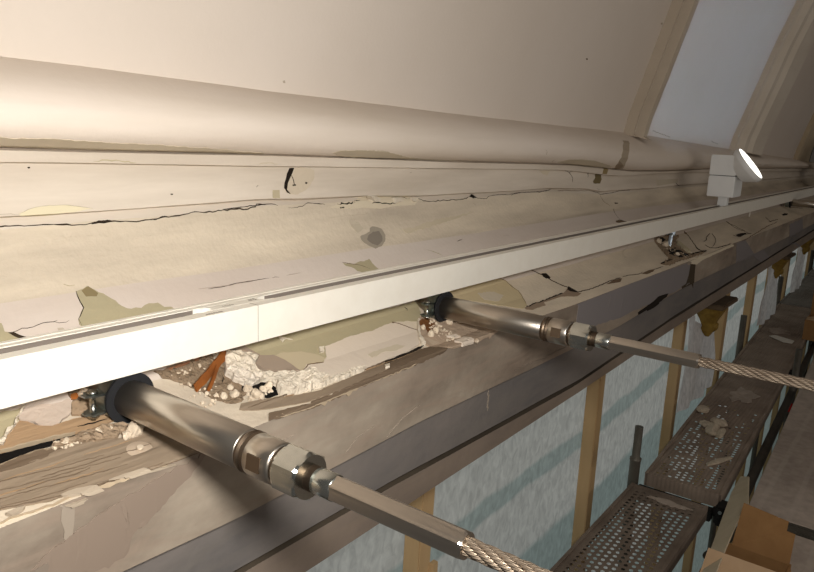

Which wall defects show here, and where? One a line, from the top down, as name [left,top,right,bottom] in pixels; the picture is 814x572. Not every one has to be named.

crack [0,160,626,227]
spalling [642,232,734,274]
crack [685,221,751,254]
peeling [76,286,174,326]
crack [501,266,663,307]
peeling [0,323,18,342]
peeling [153,317,498,417]
spalling [0,404,26,446]
peeling [0,464,175,524]